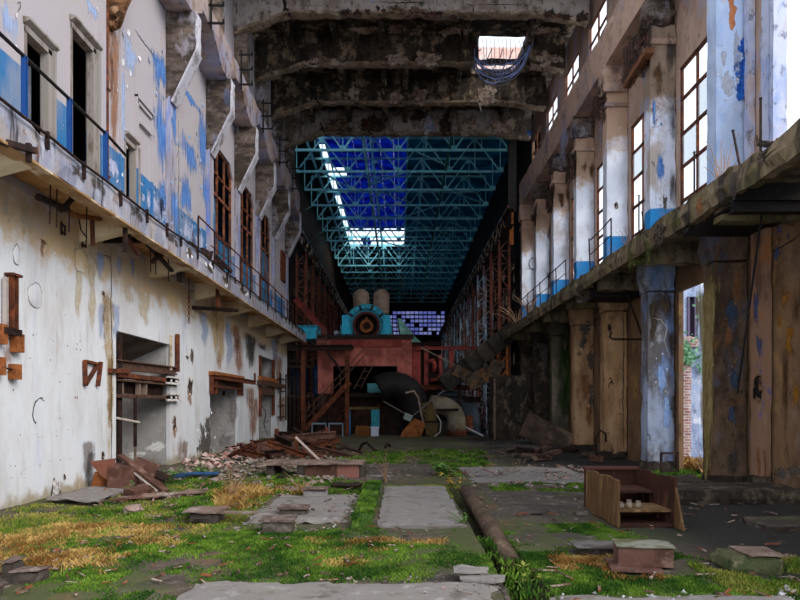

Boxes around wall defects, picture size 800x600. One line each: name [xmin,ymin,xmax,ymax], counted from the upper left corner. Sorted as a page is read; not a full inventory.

rust [109,29,118,138]
peeling [117,29,207,259]
spalling [321,86,452,140]
spalling [338,4,473,38]
spalling [385,50,443,67]
spalling [472,9,589,108]
leakage [654,37,675,88]
peeling [717,30,745,107]
leakage [76,252,119,333]
leakage [228,393,237,422]
peeling [655,353,671,430]
leakage [83,442,94,485]